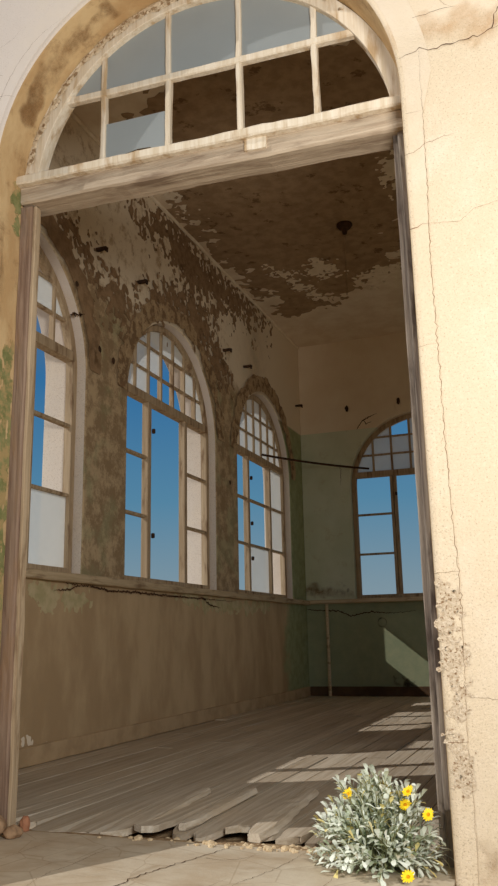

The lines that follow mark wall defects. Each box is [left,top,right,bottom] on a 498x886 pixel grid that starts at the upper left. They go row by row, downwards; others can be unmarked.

crack [401,6,498,62]
damp [21,83,43,124]
peeling [121,40,389,143]
peeling [41,149,403,481]
crack [58,582,229,607]
flaking render [434,576,478,804]